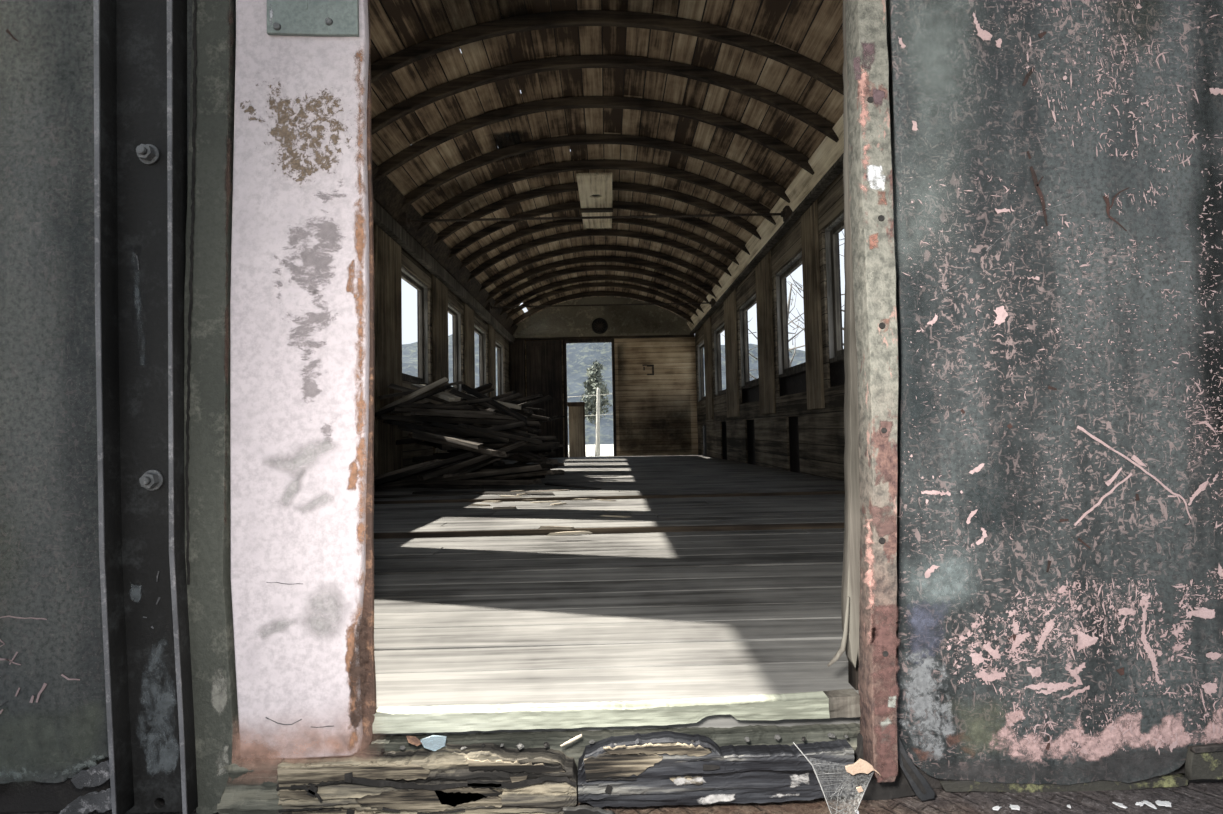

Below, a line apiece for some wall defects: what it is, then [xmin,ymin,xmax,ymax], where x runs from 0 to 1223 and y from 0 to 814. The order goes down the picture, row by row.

leakage [1197,53,1215,140]
corrosion [227,51,366,543]
peeling [898,0,1223,578]
leakage [1199,167,1223,292]
leakage [1202,322,1223,425]
corrosion [864,506,976,782]
peeling [946,564,1223,762]
peeling [0,755,112,814]